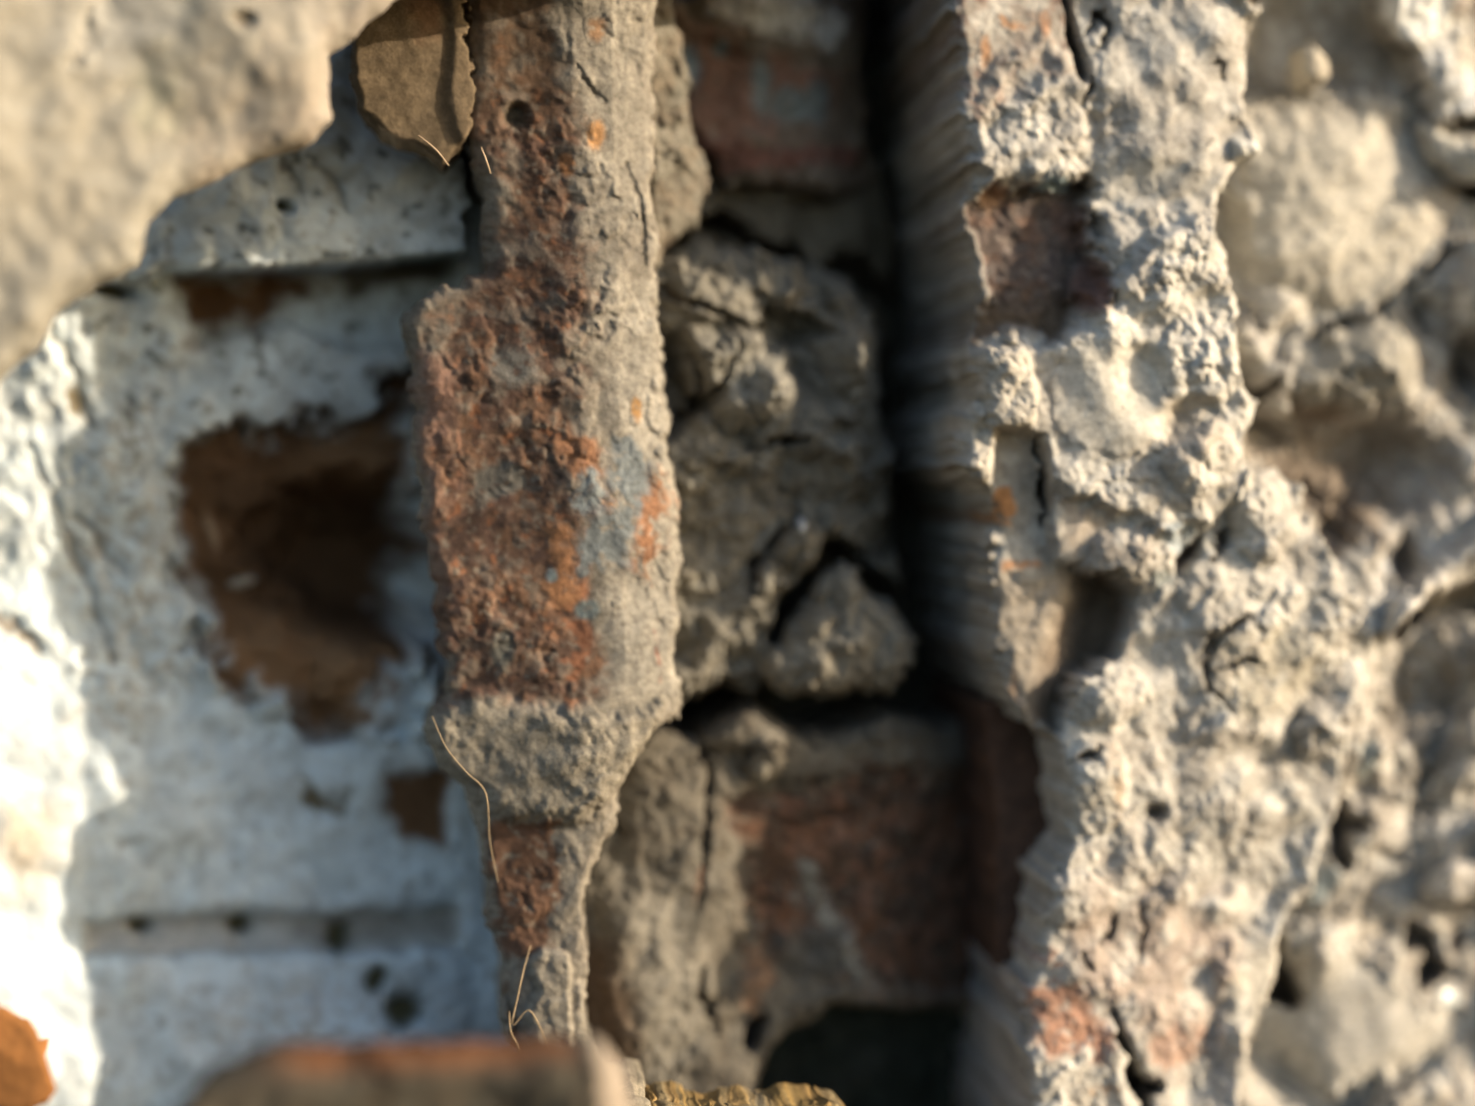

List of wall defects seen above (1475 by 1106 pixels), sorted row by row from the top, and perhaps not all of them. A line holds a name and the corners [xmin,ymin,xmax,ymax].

corrosion [671,0,865,188]
crack [1060,3,1116,105]
spalling [170,251,467,355]
corrosion [406,0,619,713]
crack [693,209,887,316]
spalling [159,356,444,750]
spalling [988,561,1185,734]
crack [1199,611,1269,713]
spalling [377,763,461,856]
corrosion [475,813,567,996]
corrosion [711,741,974,1019]
crack [1110,1009,1167,1106]